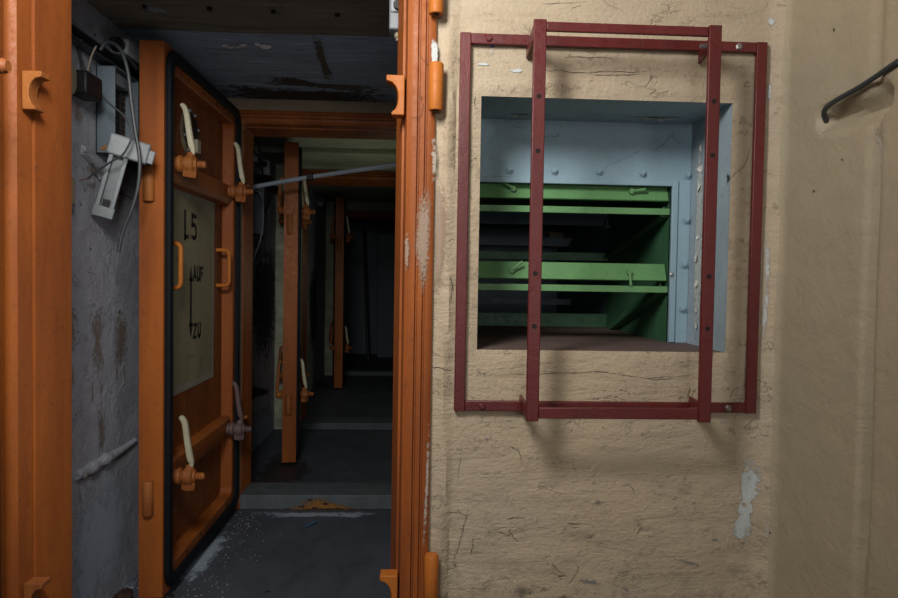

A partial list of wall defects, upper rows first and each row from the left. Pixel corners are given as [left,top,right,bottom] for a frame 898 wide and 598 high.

damp [220,38,383,102]
peeling [733,461,760,542]